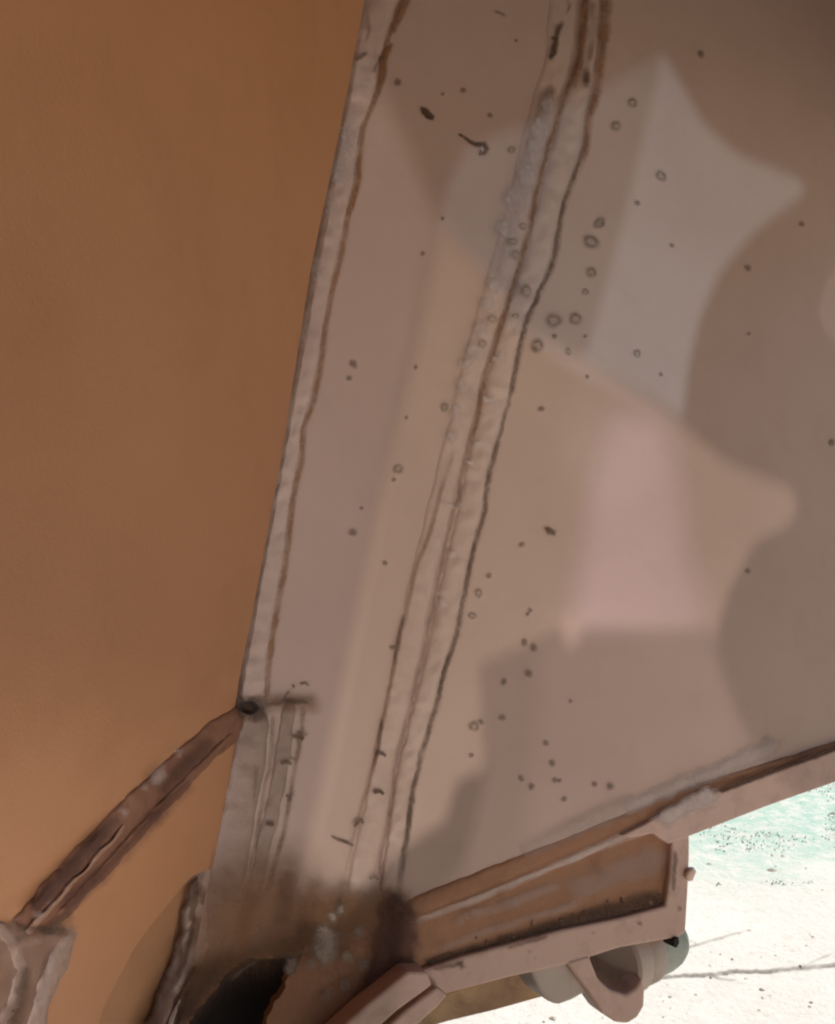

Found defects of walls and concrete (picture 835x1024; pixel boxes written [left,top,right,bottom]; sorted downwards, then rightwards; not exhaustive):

crack [511,163,579,389]
crack [402,413,506,868]